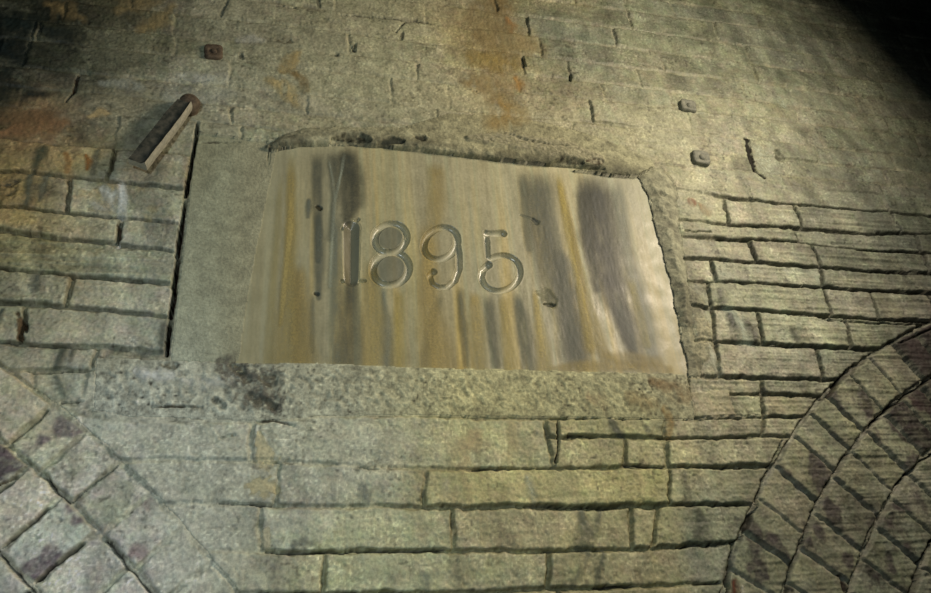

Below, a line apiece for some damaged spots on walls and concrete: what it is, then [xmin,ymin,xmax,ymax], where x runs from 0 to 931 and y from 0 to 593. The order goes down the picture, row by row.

water stain [25,147,50,204]
crack [744,138,766,179]
crack [165,130,219,357]
water stain [307,153,359,299]
water stain [521,180,581,357]
water stain [580,183,638,358]
water stain [459,294,467,351]
water stain [486,302,498,367]
spalling [216,356,283,414]